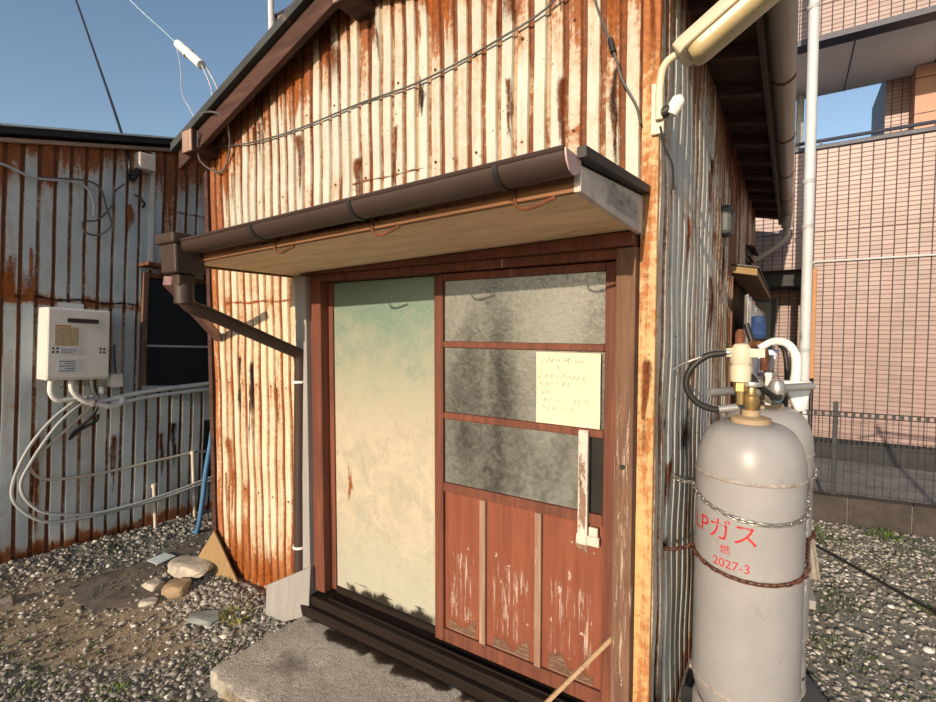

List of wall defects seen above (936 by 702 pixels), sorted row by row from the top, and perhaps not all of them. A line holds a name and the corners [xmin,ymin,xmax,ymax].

corrosion [496,0,517,38]
corrosion [321,28,341,91]
corrosion [558,78,567,155]
corrosion [609,68,617,162]
corrosion [353,158,362,195]
corrosion [238,356,255,413]
corrosion [641,361,651,420]
corrosion [230,547,274,589]
water stain [348,584,434,624]
peeling [449,548,476,639]
peeling [492,552,529,661]
peeling [548,571,593,687]